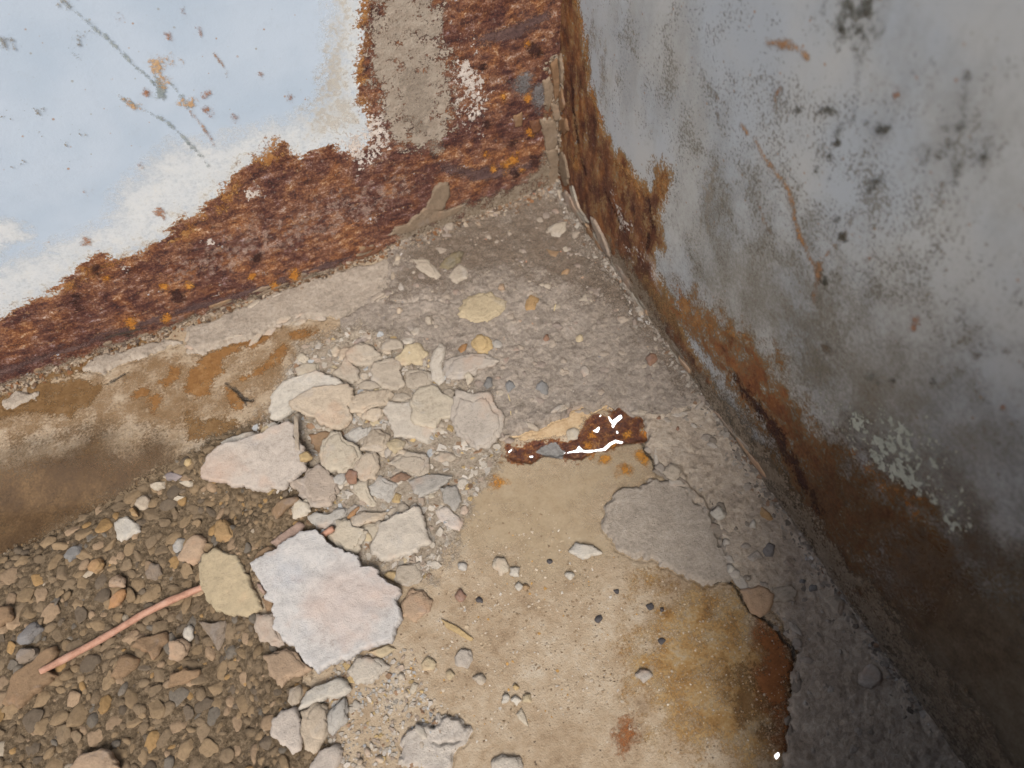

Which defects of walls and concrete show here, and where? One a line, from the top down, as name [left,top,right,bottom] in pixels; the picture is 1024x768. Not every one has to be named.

mould [836,0,876,38]
corrosion [0,0,972,637]
peeling [816,392,975,541]
corrosion [612,566,796,768]